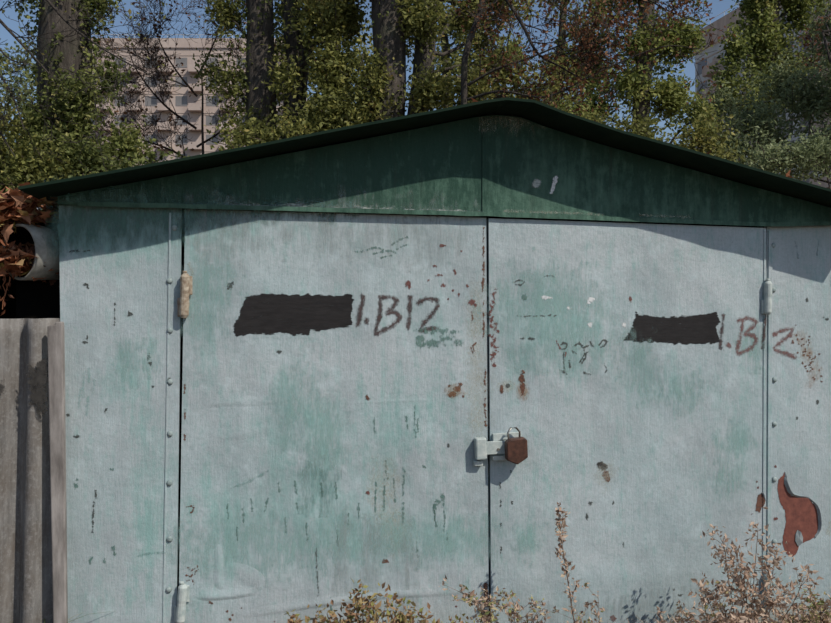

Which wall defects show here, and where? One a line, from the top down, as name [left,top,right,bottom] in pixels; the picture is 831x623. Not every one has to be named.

water stain [27,358,49,414]
corrosion [481,227,499,427]
corrosion [791,334,823,382]
peeling [773,465,822,557]